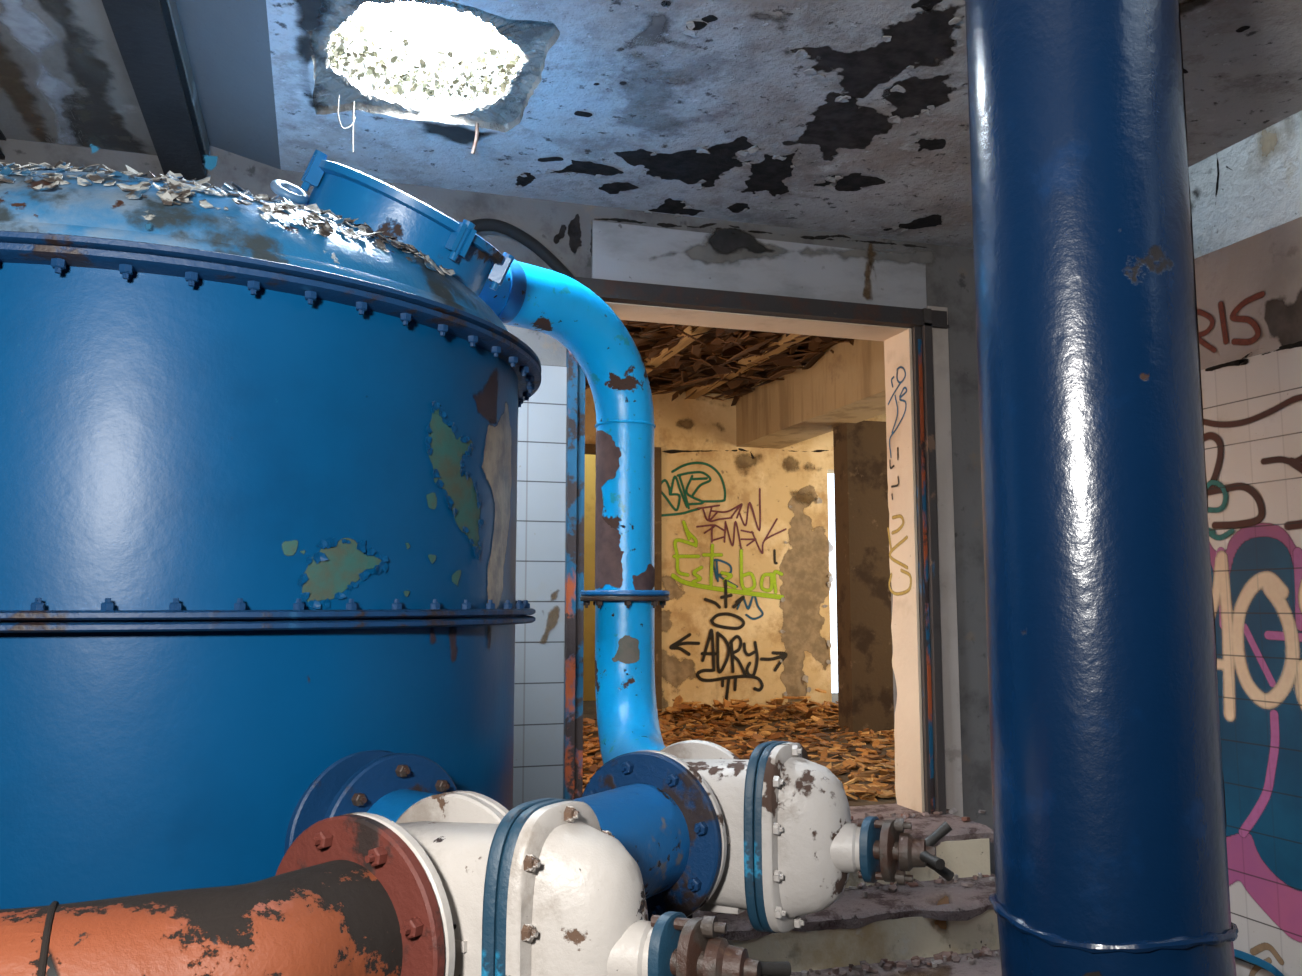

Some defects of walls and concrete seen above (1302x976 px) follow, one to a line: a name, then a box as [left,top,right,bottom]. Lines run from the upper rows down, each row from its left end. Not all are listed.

spalling [515,0,965,217]
peeling [553,214,592,255]
spalling [883,214,942,232]
flaking render [779,485,834,704]